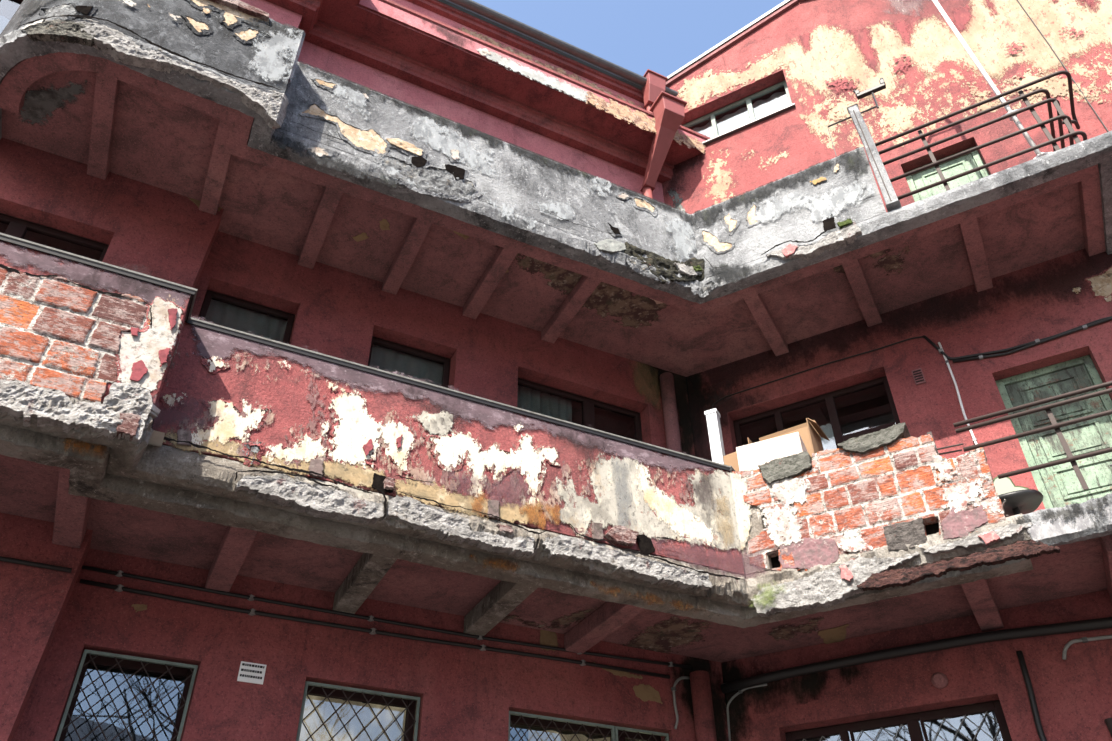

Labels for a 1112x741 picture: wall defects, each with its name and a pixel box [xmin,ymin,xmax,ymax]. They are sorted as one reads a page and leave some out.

spalling [19,0,482,203]
spalling [436,26,657,134]
peeling [677,0,1112,139]
damp [0,241,190,308]
spalling [766,210,862,261]
peeling [1073,266,1112,302]
damp [189,252,1112,472]
crack [164,437,744,580]
damp [450,470,528,505]
peeling [0,267,1060,644]
damp [652,541,765,579]
damp [1015,497,1112,541]